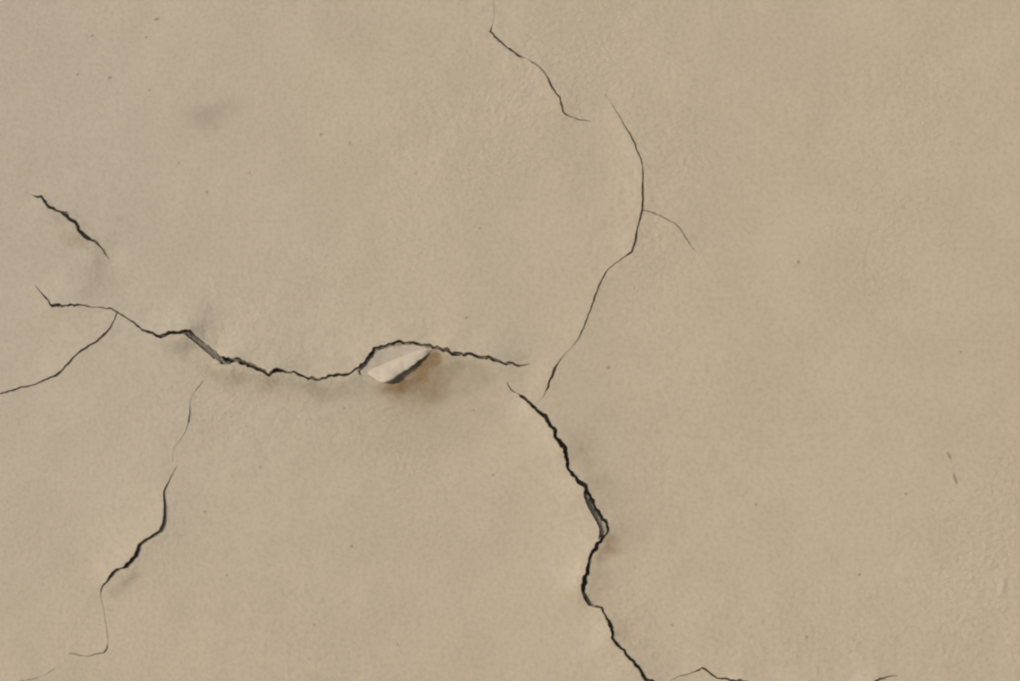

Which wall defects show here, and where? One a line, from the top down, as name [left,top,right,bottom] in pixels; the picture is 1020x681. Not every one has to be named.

crack [490,3,591,122]
crack [0,96,778,681]
peeling [358,344,433,383]
crack [869,673,898,681]